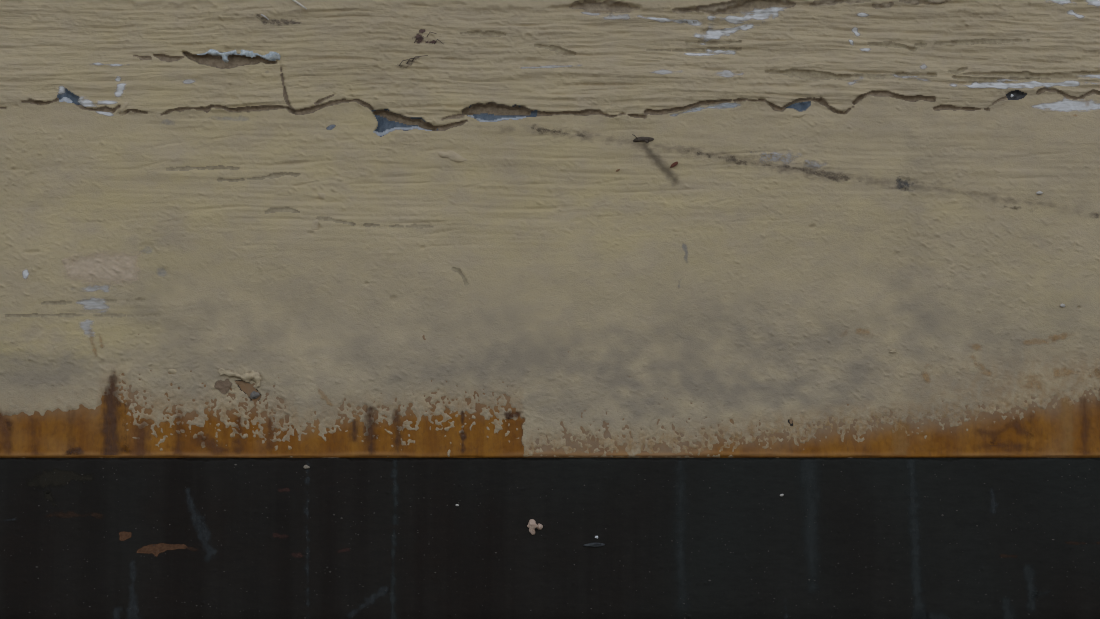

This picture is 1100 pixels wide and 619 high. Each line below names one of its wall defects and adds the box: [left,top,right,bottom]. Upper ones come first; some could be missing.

peeling [182,49,281,69]
crack [0,67,374,116]
spalling [462,102,537,122]
spalling [371,109,438,137]
crack [429,114,468,131]